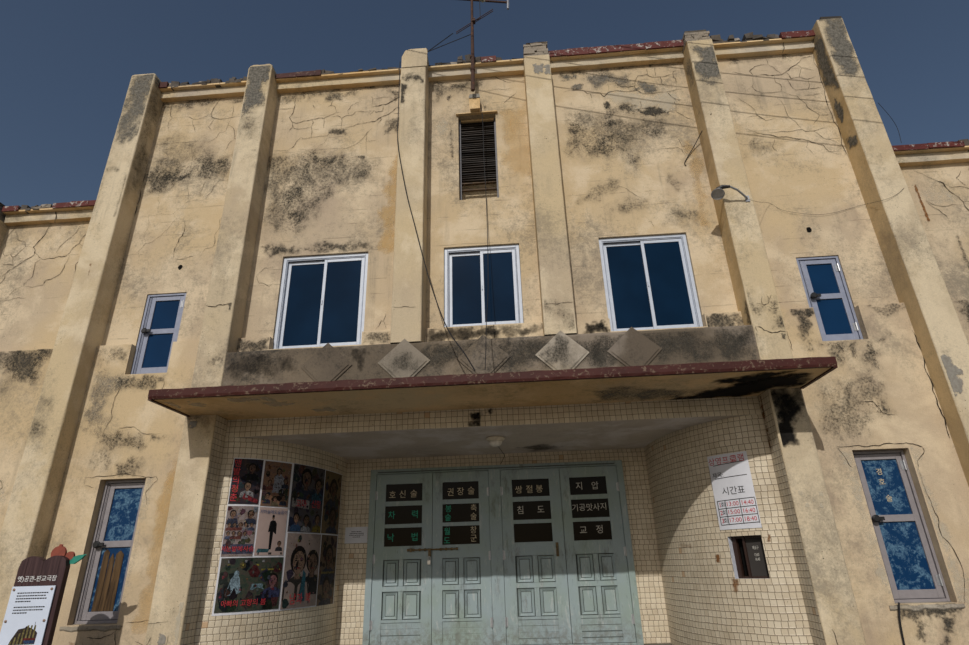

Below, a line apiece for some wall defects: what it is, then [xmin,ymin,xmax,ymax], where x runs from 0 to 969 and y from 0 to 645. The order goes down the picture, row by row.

crack [276,95,398,151]
damp [564,66,657,93]
damp [570,101,666,162]
crack [736,42,850,161]
crack [123,168,220,263]
damp [149,144,228,193]
damp [267,153,371,232]
crack [916,150,969,216]
crack [0,212,85,301]
damp [774,303,814,350]
damp [0,349,52,380]
peeling [940,354,963,396]